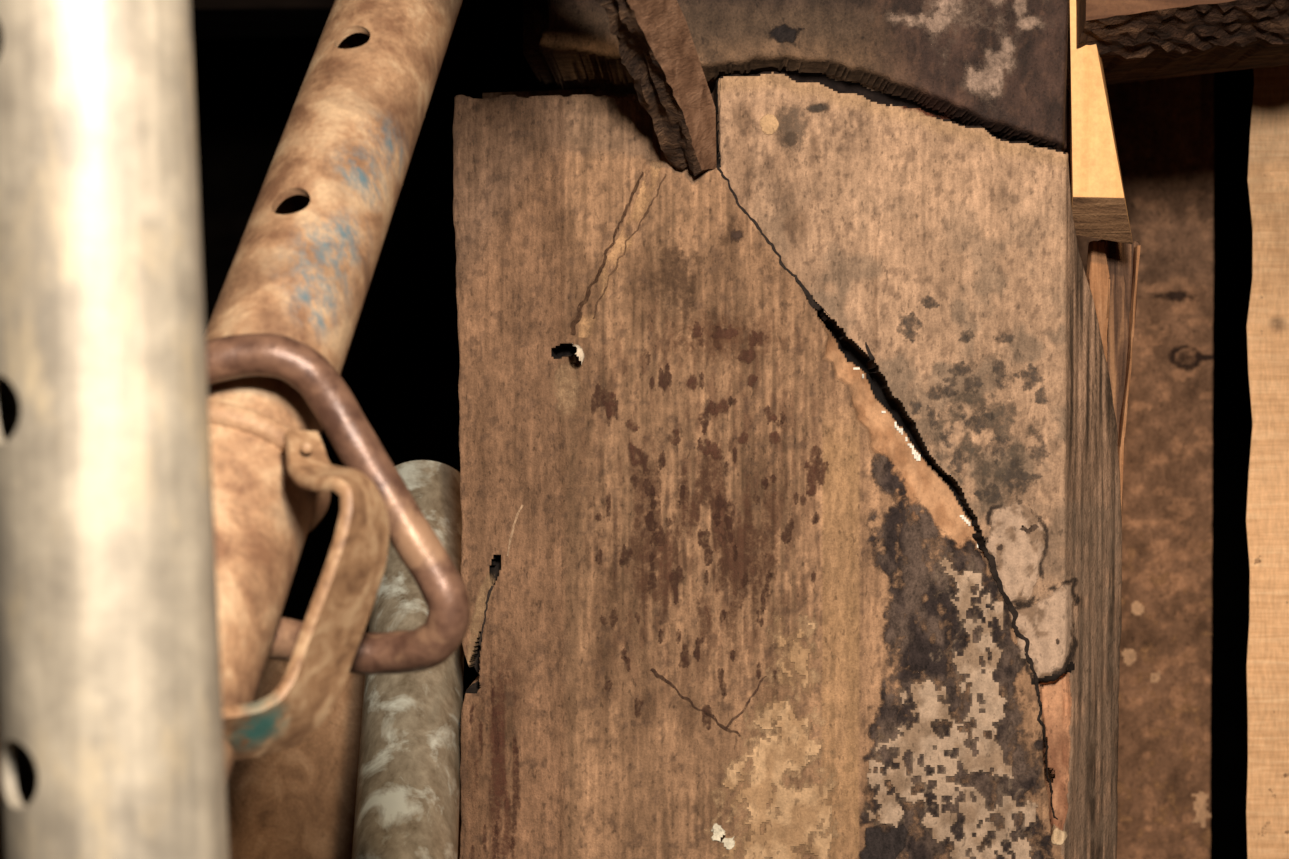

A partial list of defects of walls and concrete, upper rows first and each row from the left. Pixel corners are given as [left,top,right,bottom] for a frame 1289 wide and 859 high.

water stain [890,0,966,32]
water stain [966,0,1043,98]
water stain [646,354,672,390]
water stain [591,384,618,426]
water stain [698,407,710,443]
crack [712,69,1066,819]
water stain [620,448,794,666]
crack [479,586,494,645]
water stain [859,454,1054,859]